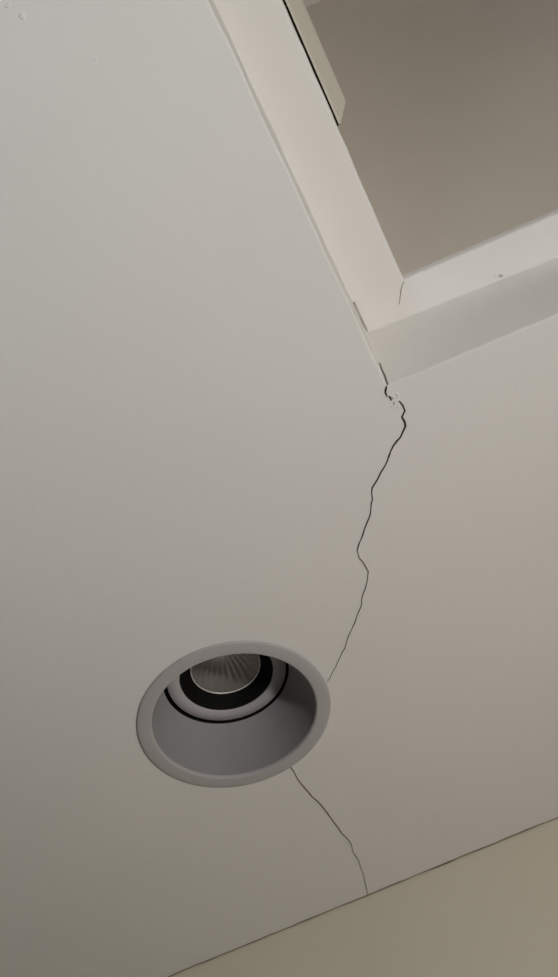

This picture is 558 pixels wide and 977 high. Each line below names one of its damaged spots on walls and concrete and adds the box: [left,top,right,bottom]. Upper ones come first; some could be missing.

crack [327,362,406,682]